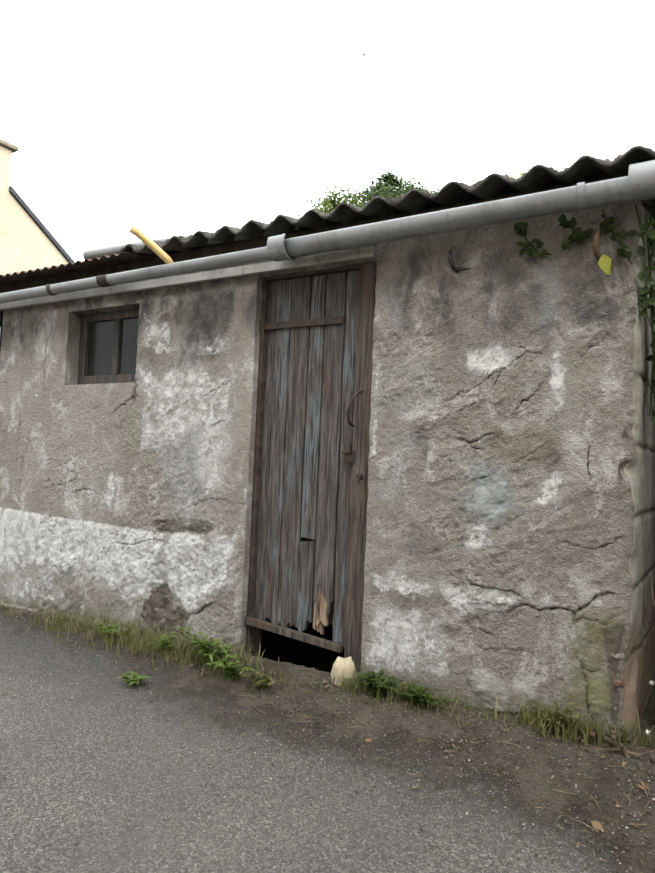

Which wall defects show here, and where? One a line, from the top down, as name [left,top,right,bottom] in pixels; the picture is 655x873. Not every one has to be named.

crack [458,346,536,411]
crack [472,584,608,628]